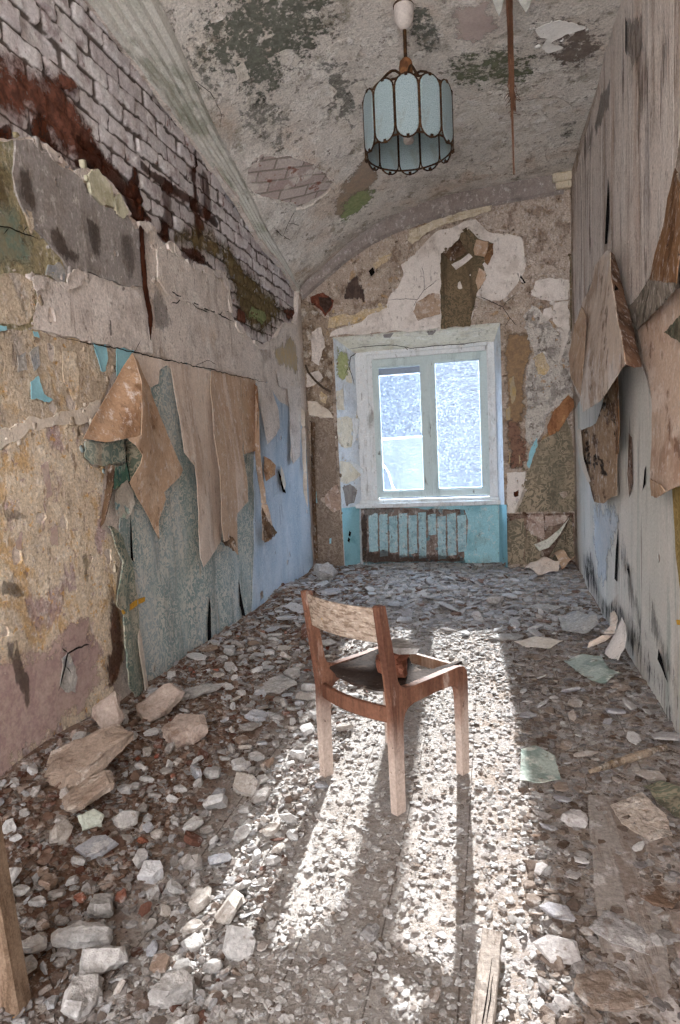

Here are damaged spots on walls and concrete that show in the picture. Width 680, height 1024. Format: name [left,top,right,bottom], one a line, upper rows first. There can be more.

peeling [529,20,589,54]
rust [0,53,218,340]
leakage [159,220,209,265]
leakage [236,306,266,325]
flaking render [0,0,577,770]
rust [361,507,468,564]
crack [58,644,89,691]